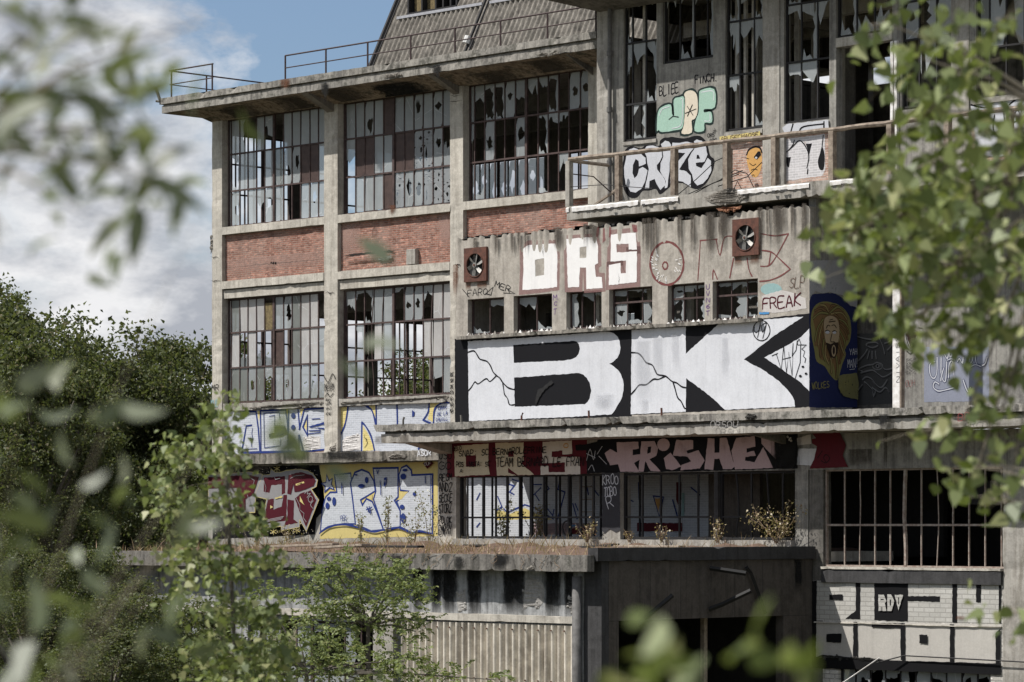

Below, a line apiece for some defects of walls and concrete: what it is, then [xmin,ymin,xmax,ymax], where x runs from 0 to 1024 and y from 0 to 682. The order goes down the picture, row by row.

leakage [642,218,656,246]
leakage [413,557,481,606]
leakage [493,554,524,606]
leakage [545,572,573,607]